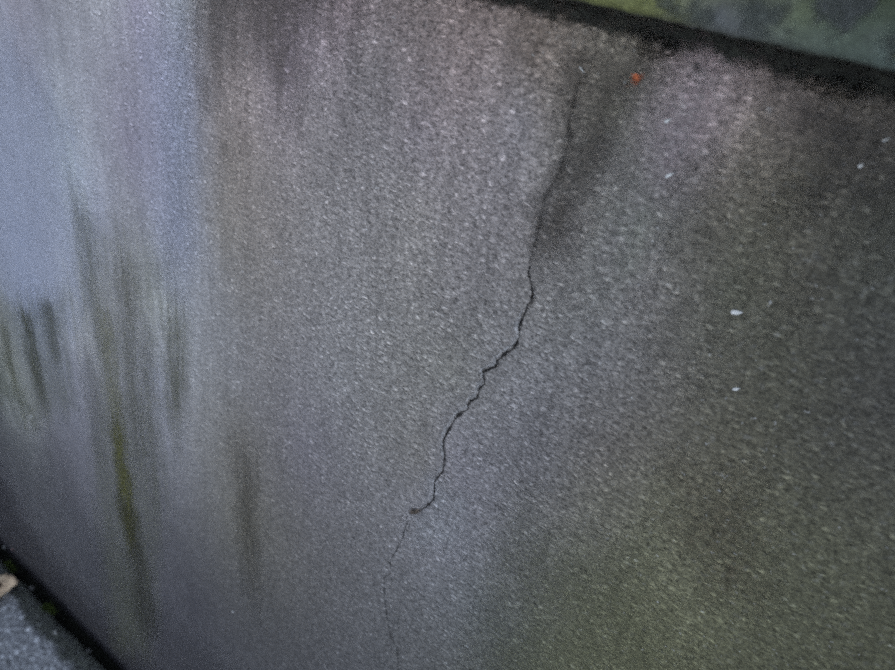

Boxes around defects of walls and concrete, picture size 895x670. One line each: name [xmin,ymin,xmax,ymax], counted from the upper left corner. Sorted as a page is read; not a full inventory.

leakage [0,72,79,300]
crack [383,265,534,668]
leakage [0,560,105,670]